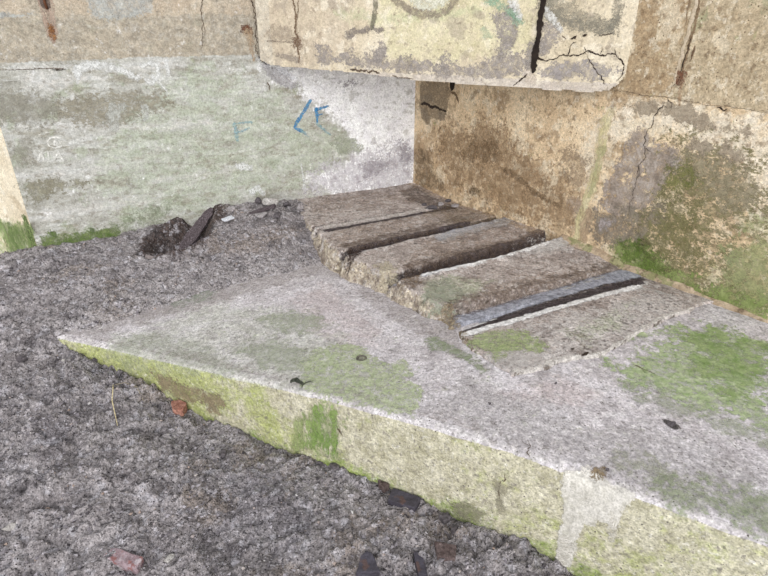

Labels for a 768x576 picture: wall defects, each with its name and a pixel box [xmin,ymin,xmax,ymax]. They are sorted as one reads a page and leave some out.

crack [513,0,768,211]